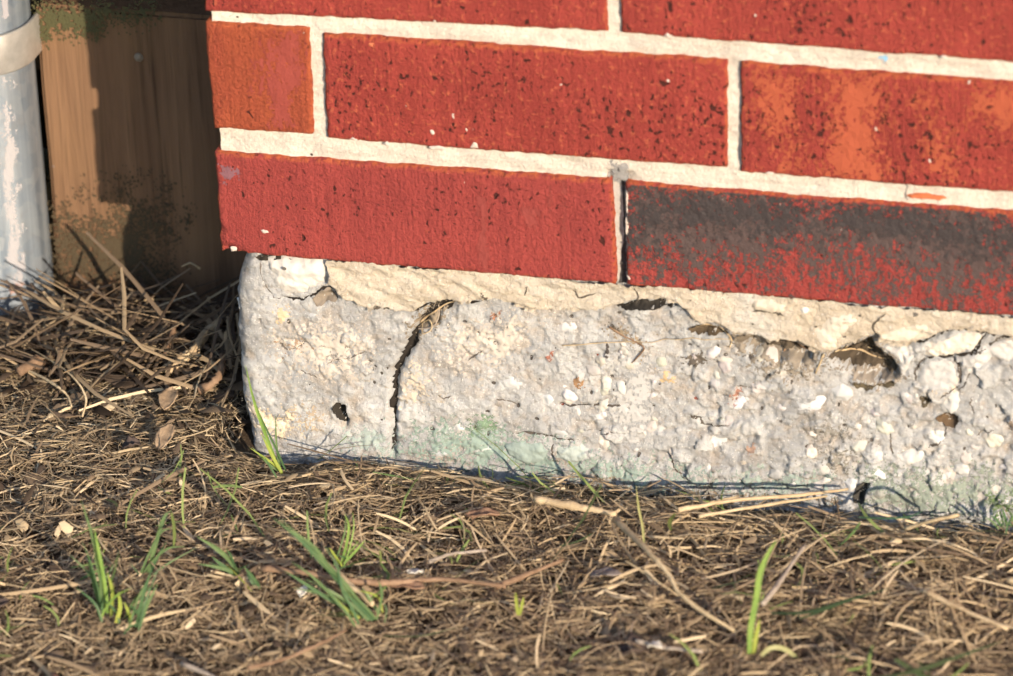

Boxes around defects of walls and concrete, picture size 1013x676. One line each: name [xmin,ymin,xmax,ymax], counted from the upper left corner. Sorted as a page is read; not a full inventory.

crack [390,293,488,451]
spalling [617,298,676,314]
spalling [688,323,1013,505]
crack [914,329,1010,435]